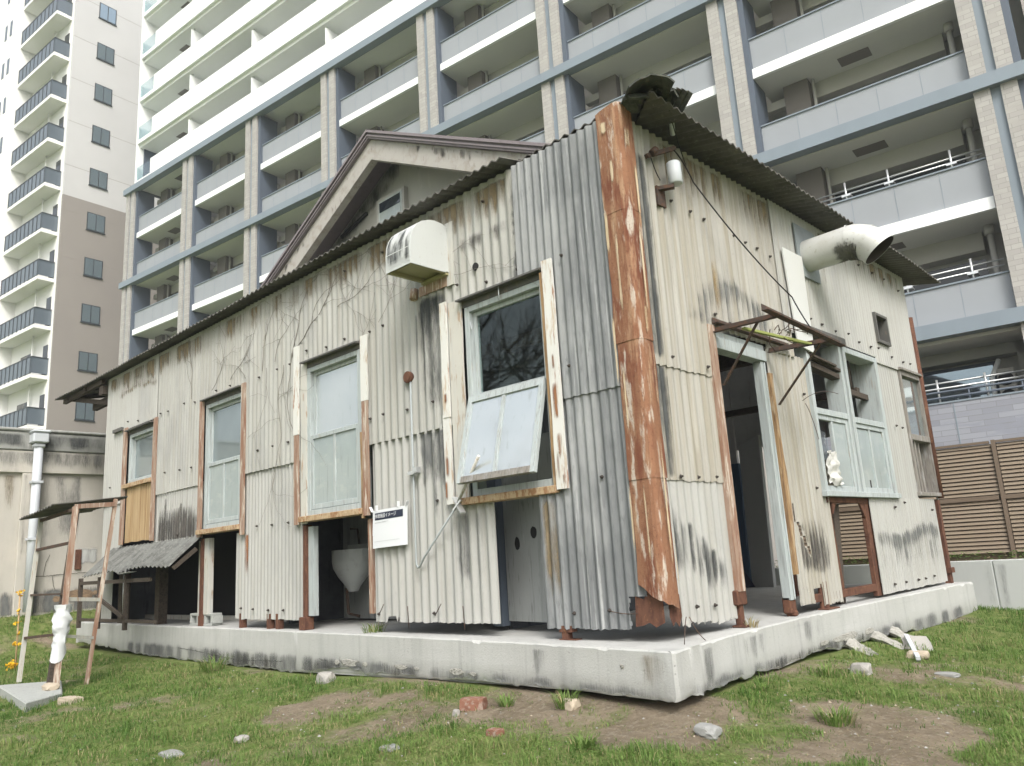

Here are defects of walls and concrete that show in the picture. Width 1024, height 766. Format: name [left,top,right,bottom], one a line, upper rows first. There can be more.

damp [420,295,444,383]
damp [674,525,723,583]
damp [879,524,938,558]
damp [128,642,218,662]
damp [233,651,337,671]
damp [350,663,386,674]